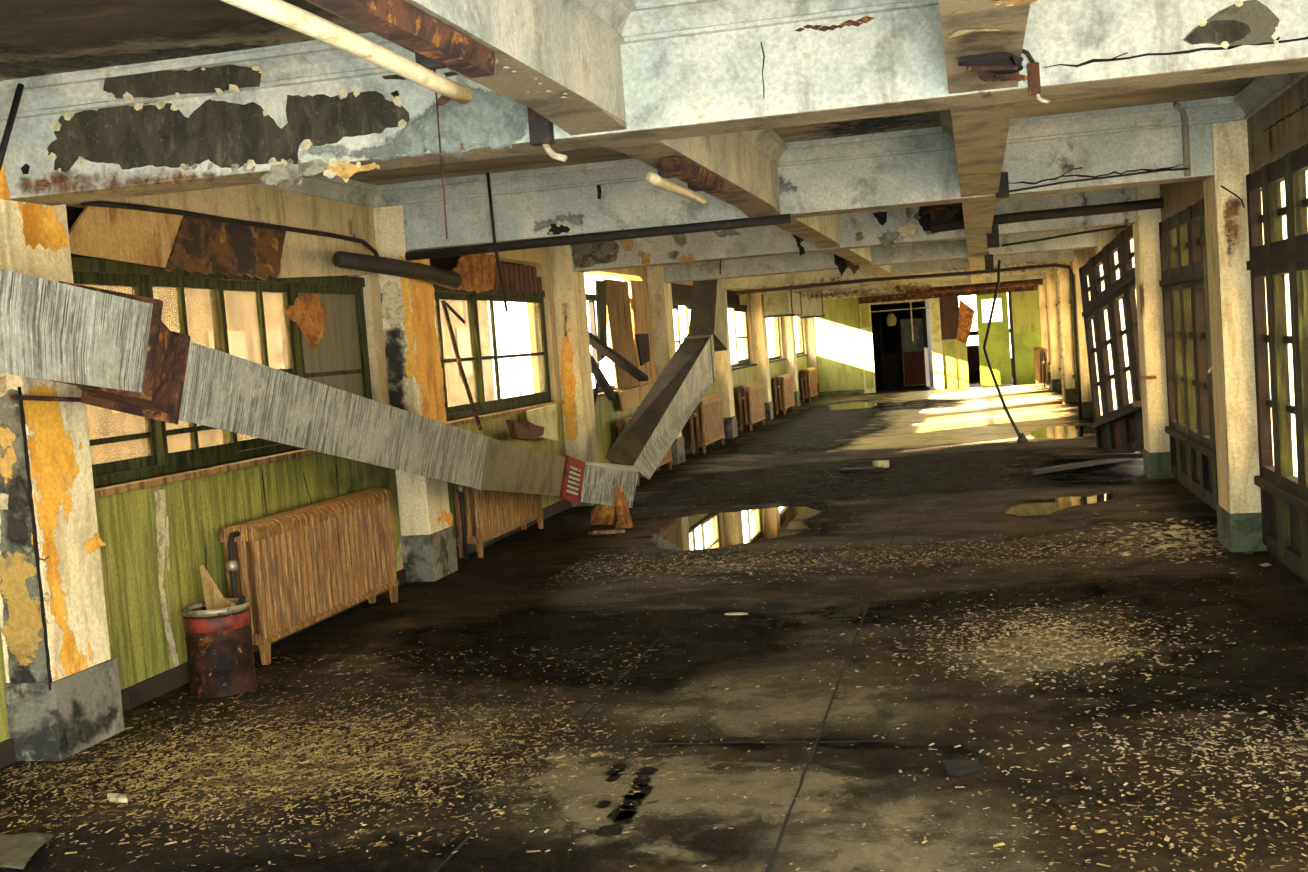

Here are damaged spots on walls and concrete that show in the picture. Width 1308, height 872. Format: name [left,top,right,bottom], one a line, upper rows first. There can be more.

peeling [1183,0,1280,49]
crack [1044,37,1308,68]
peeling [44,64,410,183]
crack [1262,94,1308,132]
crack [1009,164,1184,184]
peeling [0,163,69,252]
crack [1216,185,1245,485]
peeling [0,382,94,680]
peeling [84,532,105,554]